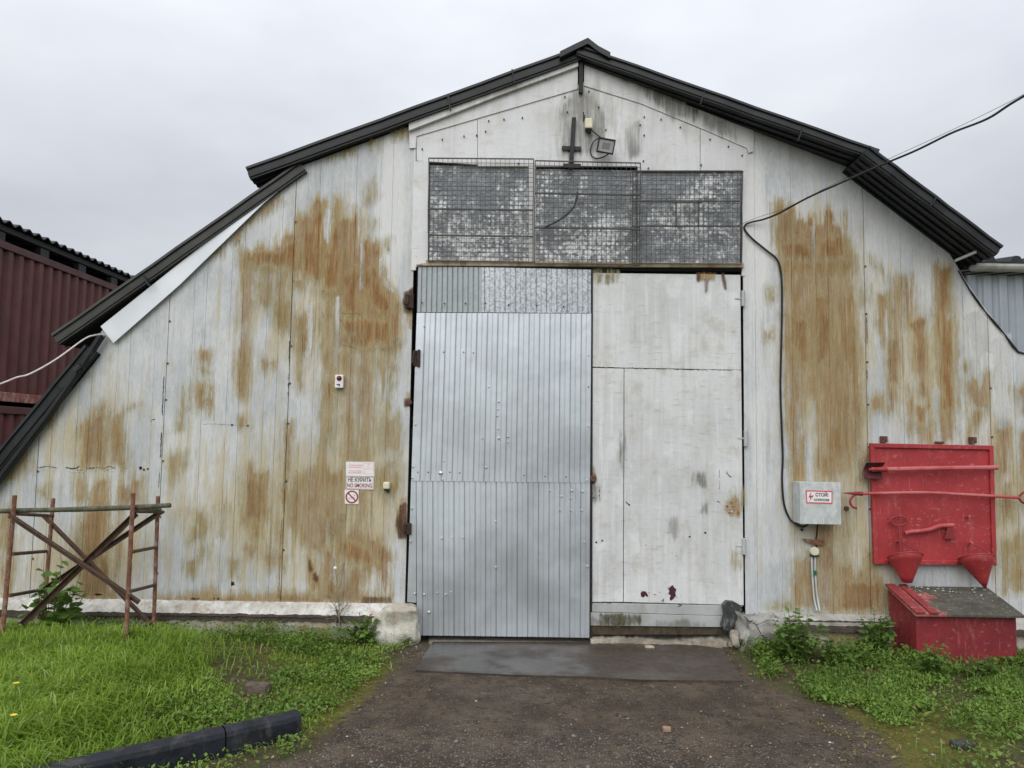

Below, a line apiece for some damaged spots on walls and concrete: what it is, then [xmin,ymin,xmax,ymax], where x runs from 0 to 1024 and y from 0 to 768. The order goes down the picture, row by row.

rust [157,179,413,603]
rust [697,273,727,289]
rust [764,200,992,488]
rust [70,401,143,599]
peeling [641,585,677,600]
rust [769,514,889,615]
rust [995,423,1024,596]